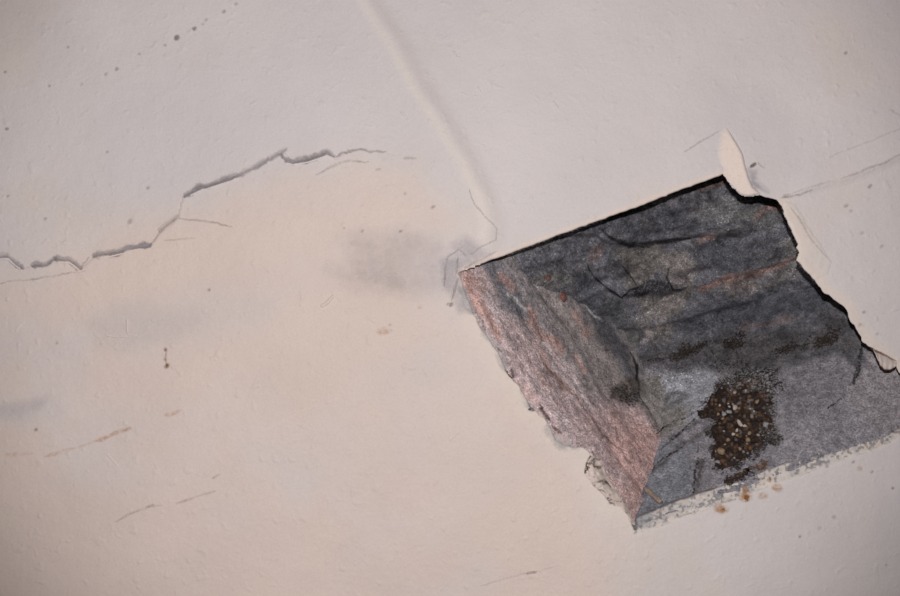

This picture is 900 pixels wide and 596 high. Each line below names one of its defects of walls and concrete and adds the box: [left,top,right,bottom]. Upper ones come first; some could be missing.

crack [260,151,334,167]
crack [184,175,239,198]
peeling [784,201,832,279]
crack [0,242,151,272]
peeling [871,348,897,370]
spalling [583,428,900,540]